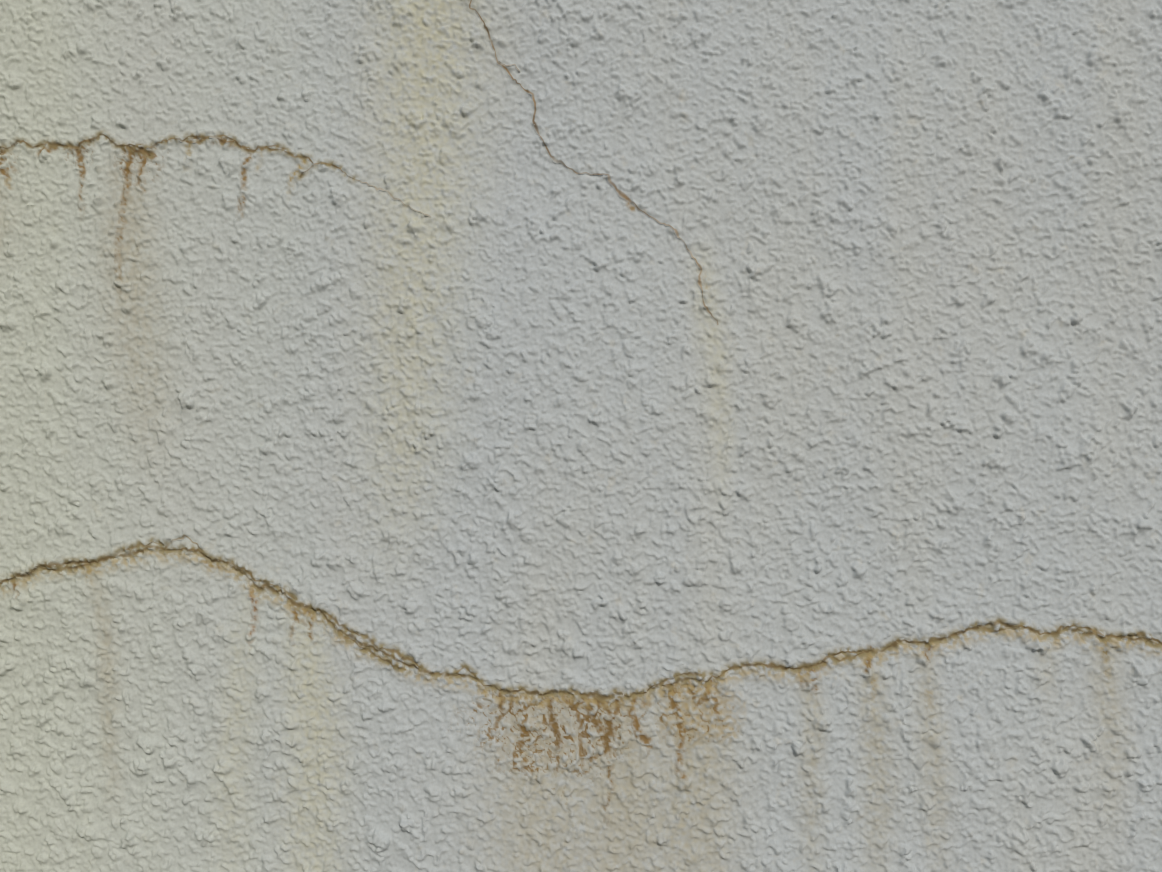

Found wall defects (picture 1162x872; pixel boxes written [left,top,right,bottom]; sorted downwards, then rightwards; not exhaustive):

crack [0,127,431,217]
crack [465,0,719,325]
crack [0,533,1162,715]
rust [446,679,749,827]